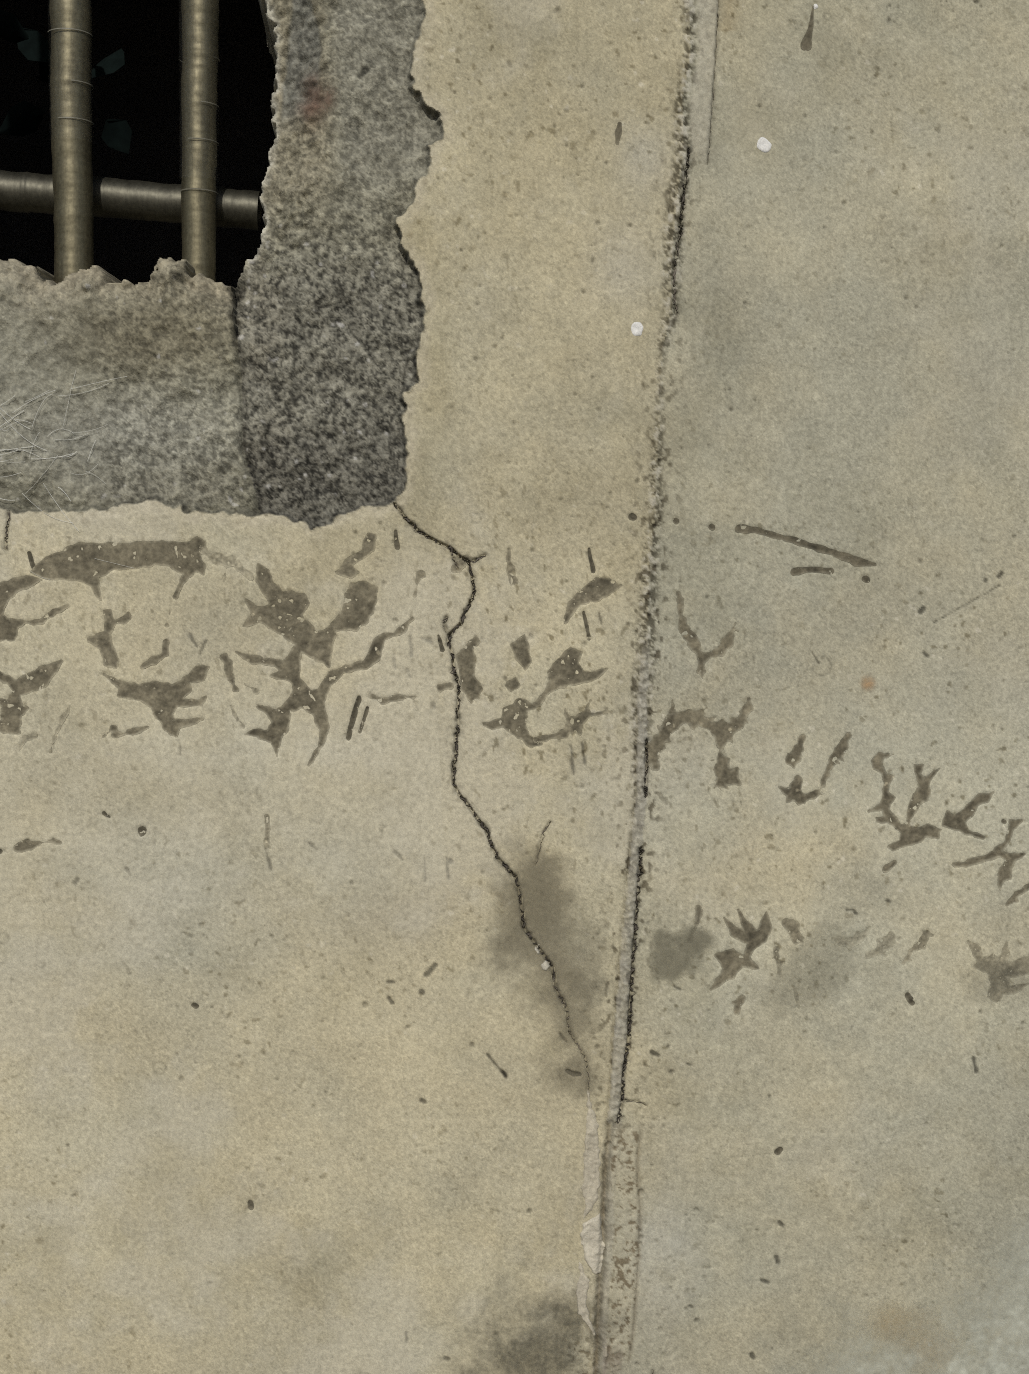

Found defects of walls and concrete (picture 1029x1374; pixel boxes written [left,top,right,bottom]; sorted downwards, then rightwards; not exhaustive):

spalling [0,0,445,531]
crack [673,7,719,313]
crack [394,505,645,1123]
crack [642,740,650,797]
water stain [654,929,709,977]
water stain [497,1304,579,1374]